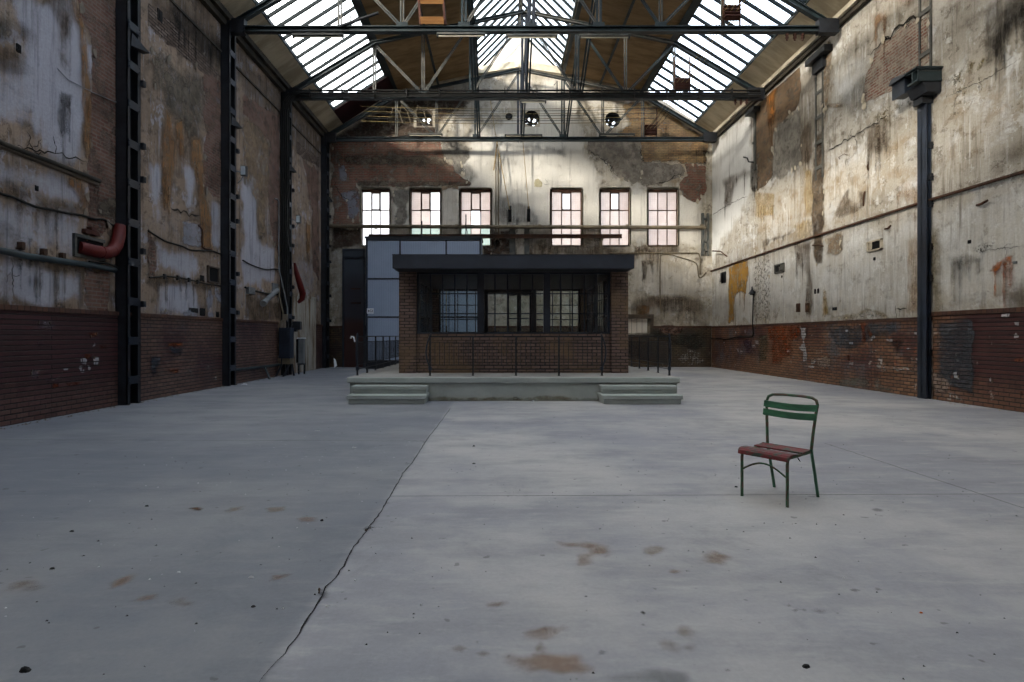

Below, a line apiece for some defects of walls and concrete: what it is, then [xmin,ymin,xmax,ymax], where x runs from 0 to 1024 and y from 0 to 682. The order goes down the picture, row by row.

flaking render [861,17,930,110]
leakage [954,0,1024,113]
crack [18,135,106,215]
flaking render [297,101,472,281]
flaking render [584,101,709,204]
flaking render [756,40,842,266]
corrosion [990,256,1012,305]
crack [259,411,449,682]